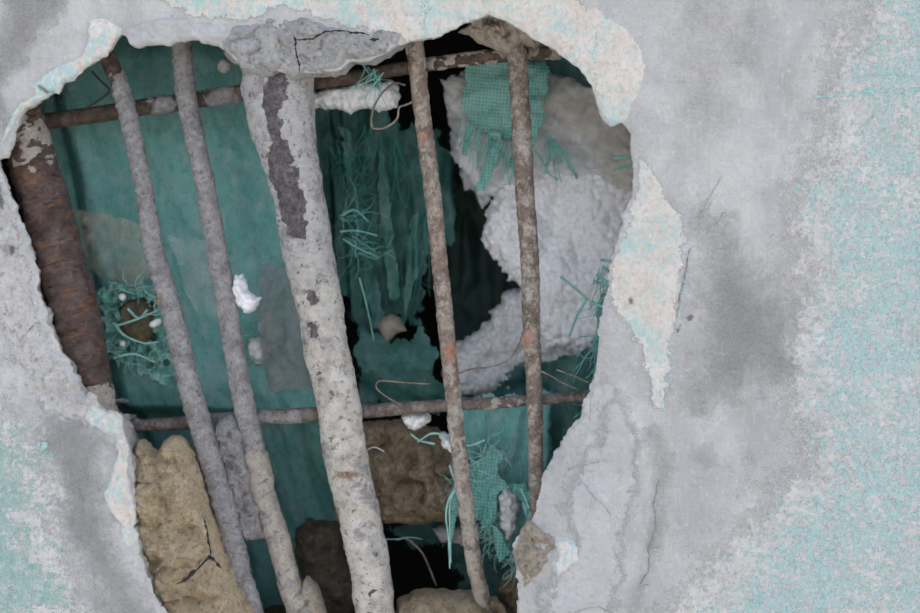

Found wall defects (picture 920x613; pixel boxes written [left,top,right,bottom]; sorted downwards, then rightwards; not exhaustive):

crack [293,30,379,73]
spalling [0,0,646,613]
flaking render [608,141,693,411]